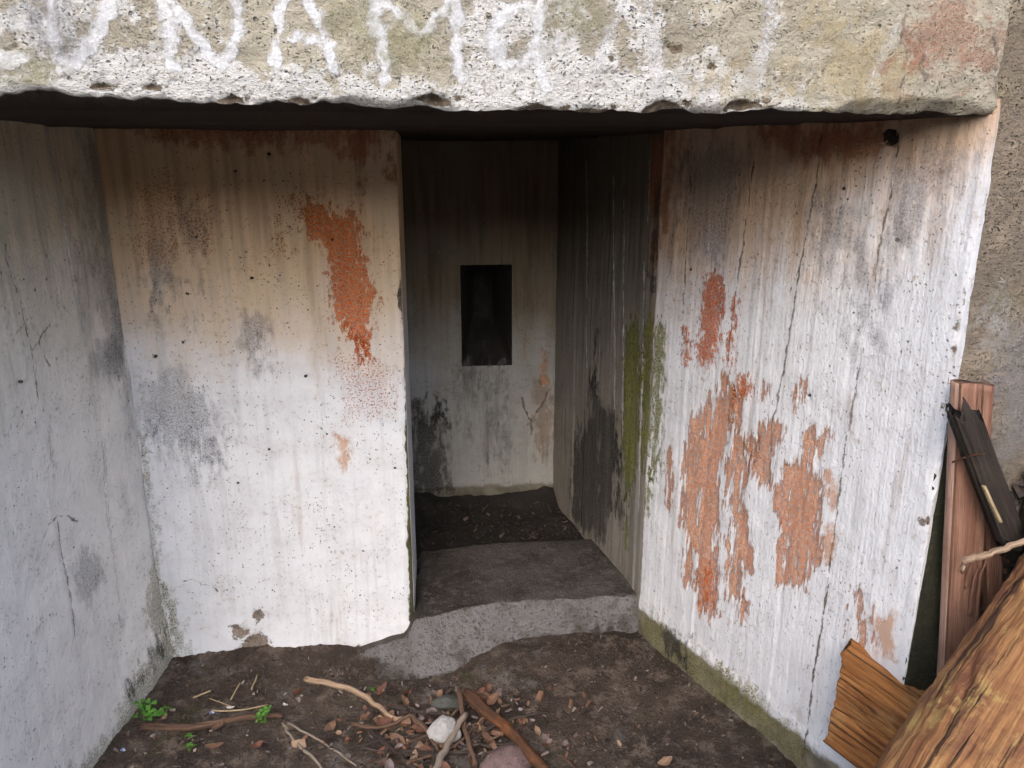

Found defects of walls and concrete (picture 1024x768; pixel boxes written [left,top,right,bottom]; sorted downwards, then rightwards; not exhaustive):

rust [265,188,397,424]
damp [411,392,454,495]
damp [569,262,654,550]
peeling [662,368,835,628]
crack [769,137,822,483]
spalling [228,607,272,650]